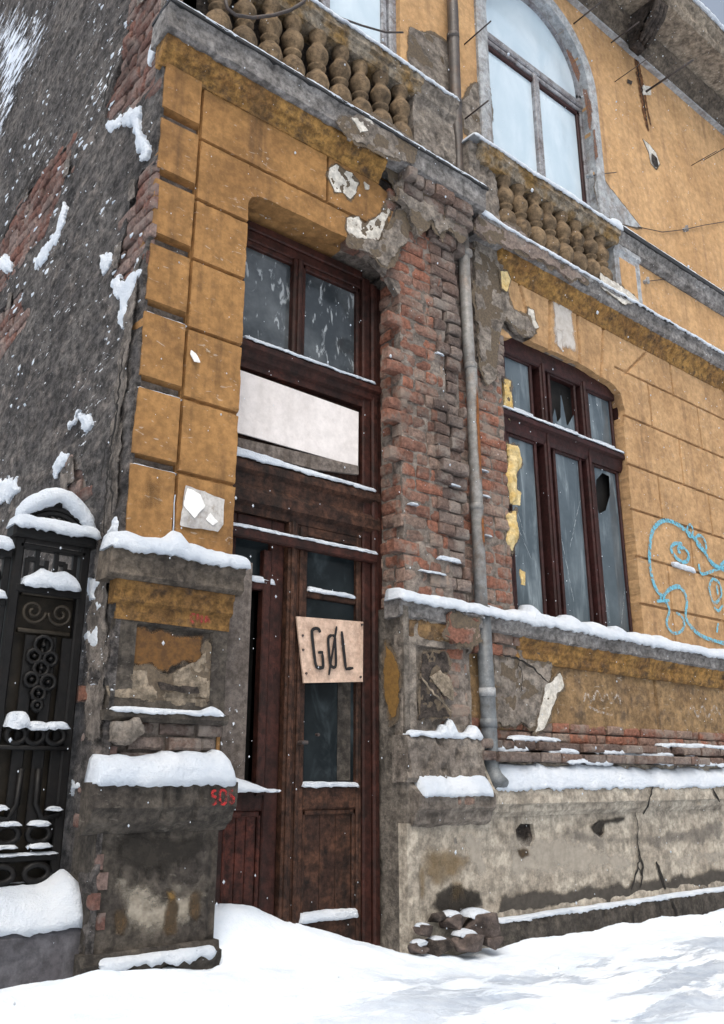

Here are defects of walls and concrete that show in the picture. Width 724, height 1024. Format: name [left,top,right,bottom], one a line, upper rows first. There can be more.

spalling [407,27,449,91]
corrosion [635,59,651,131]
peeling [326,163,369,201]
spalling [0,131,78,359]
spalling [76,159,222,756]
spalling [335,112,642,737]
crack [500,654,548,690]
leakage [433,885,482,912]
hole [516,824,532,858]
hole [591,817,624,837]
leakage [499,839,724,912]
crack [631,787,678,923]